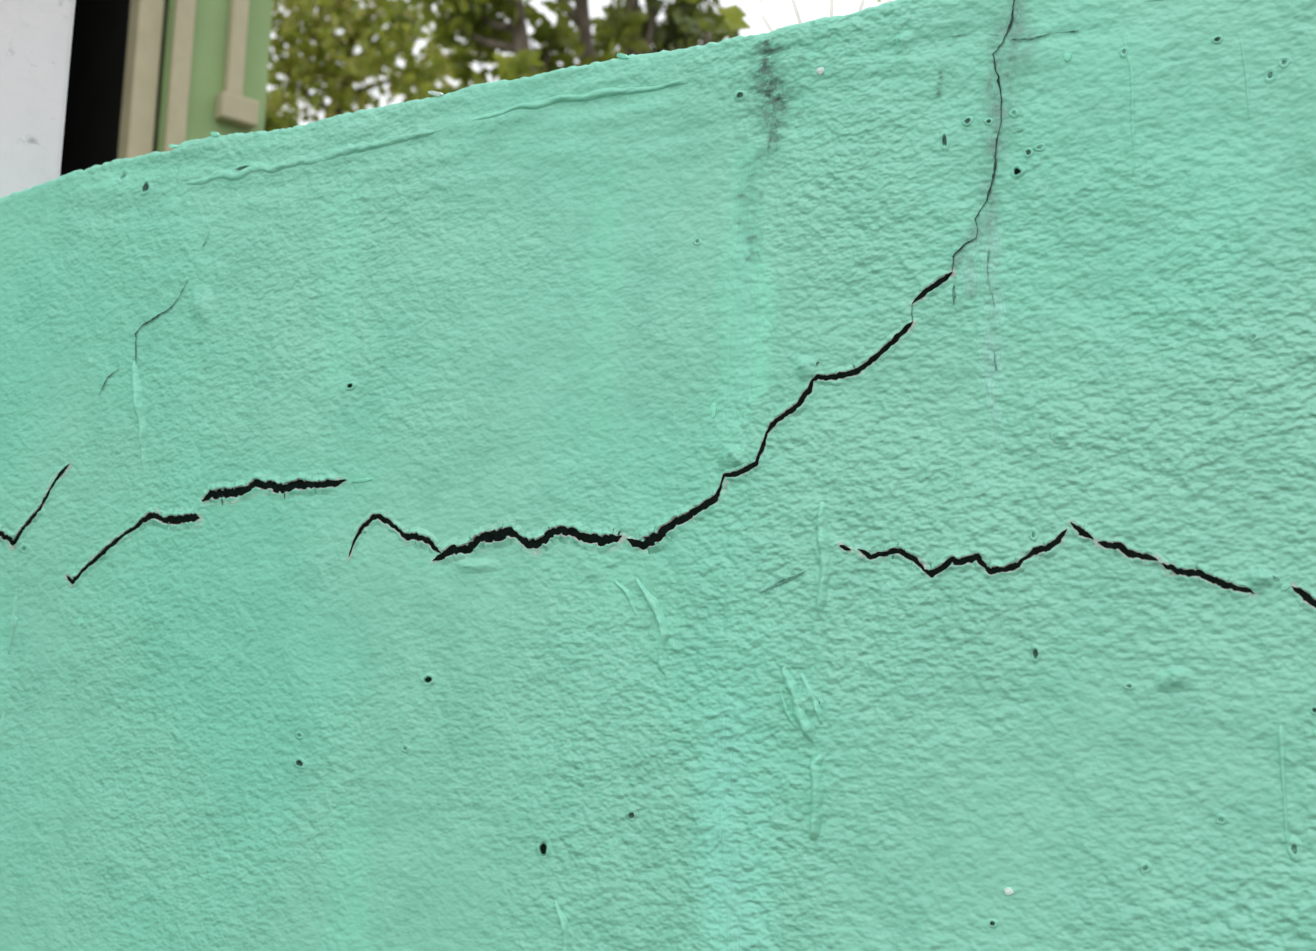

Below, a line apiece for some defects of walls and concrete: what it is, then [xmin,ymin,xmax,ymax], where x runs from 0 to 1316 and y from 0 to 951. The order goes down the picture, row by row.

crack [99,280,188,395]
crack [347,0,1079,566]
crack [0,463,71,550]
crack [65,472,347,589]
crack [760,571,806,593]
crack [838,520,1316,615]